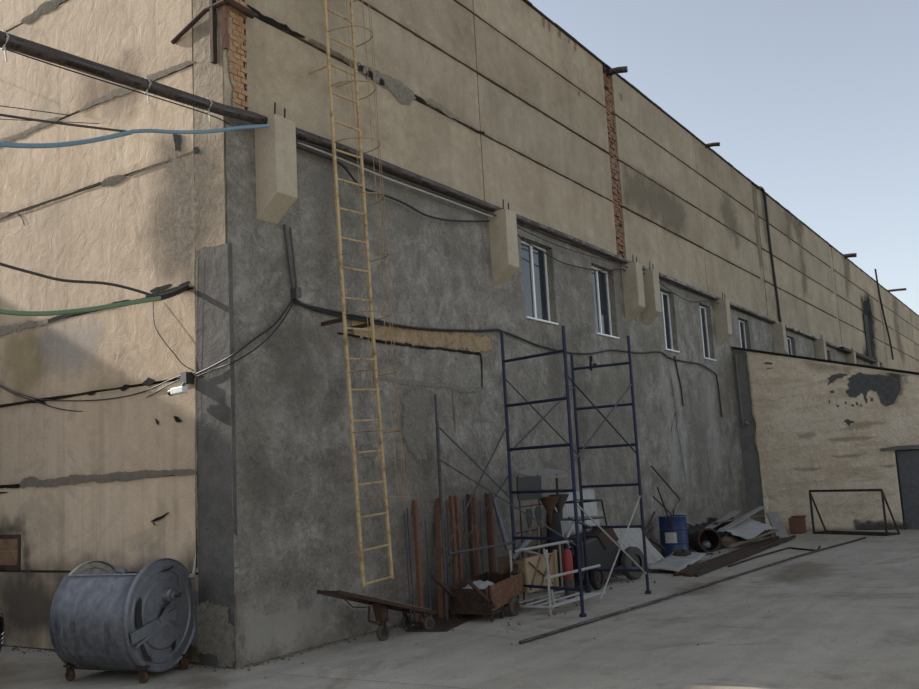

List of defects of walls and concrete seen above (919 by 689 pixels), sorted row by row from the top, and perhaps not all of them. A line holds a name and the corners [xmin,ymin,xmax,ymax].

spalling [358,62,416,106]
spalling [0,319,48,336]
peeling [828,372,900,407]